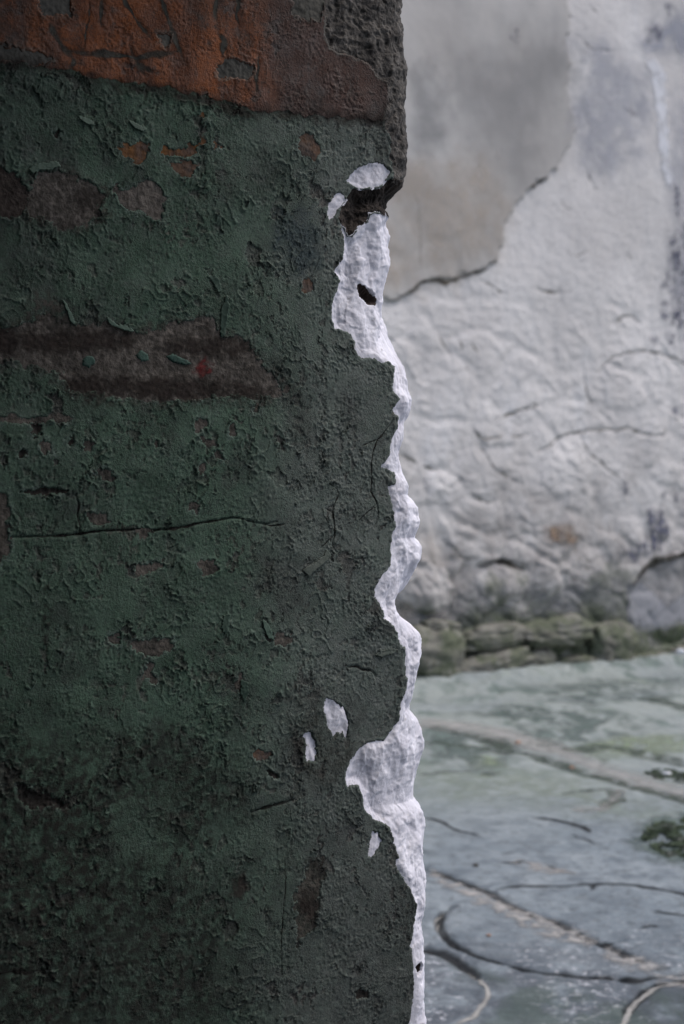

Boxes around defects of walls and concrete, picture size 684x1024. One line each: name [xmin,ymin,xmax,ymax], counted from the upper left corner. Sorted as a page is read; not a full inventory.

peeling [117,120,223,178]
peeling [0,300,290,412]
crack [604,350,684,366]
crack [362,424,390,519]
crack [475,406,542,481]
crack [547,427,666,477]
crack [40,499,282,537]
crack [323,487,339,546]
spalling [291,0,427,1024]